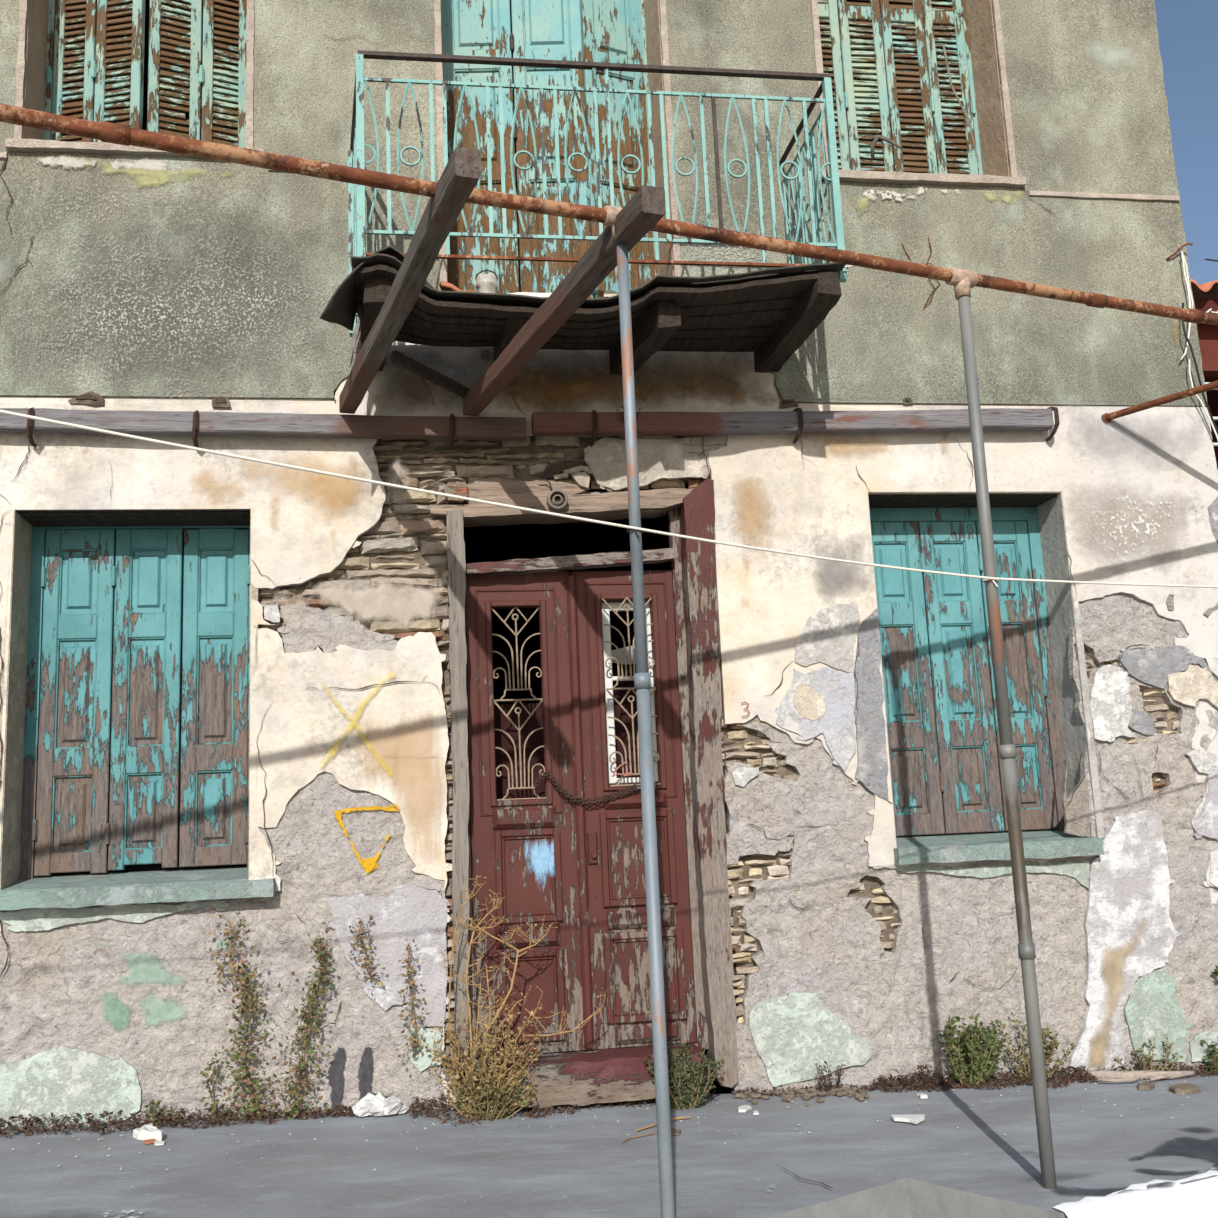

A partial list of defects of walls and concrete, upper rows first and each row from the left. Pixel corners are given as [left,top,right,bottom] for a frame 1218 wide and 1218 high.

crack [0,149,44,293]
flaking render [259,435,727,670]
crack [0,920,12,978]
flaking render [0,686,465,1130]
flaking render [721,593,1218,1094]